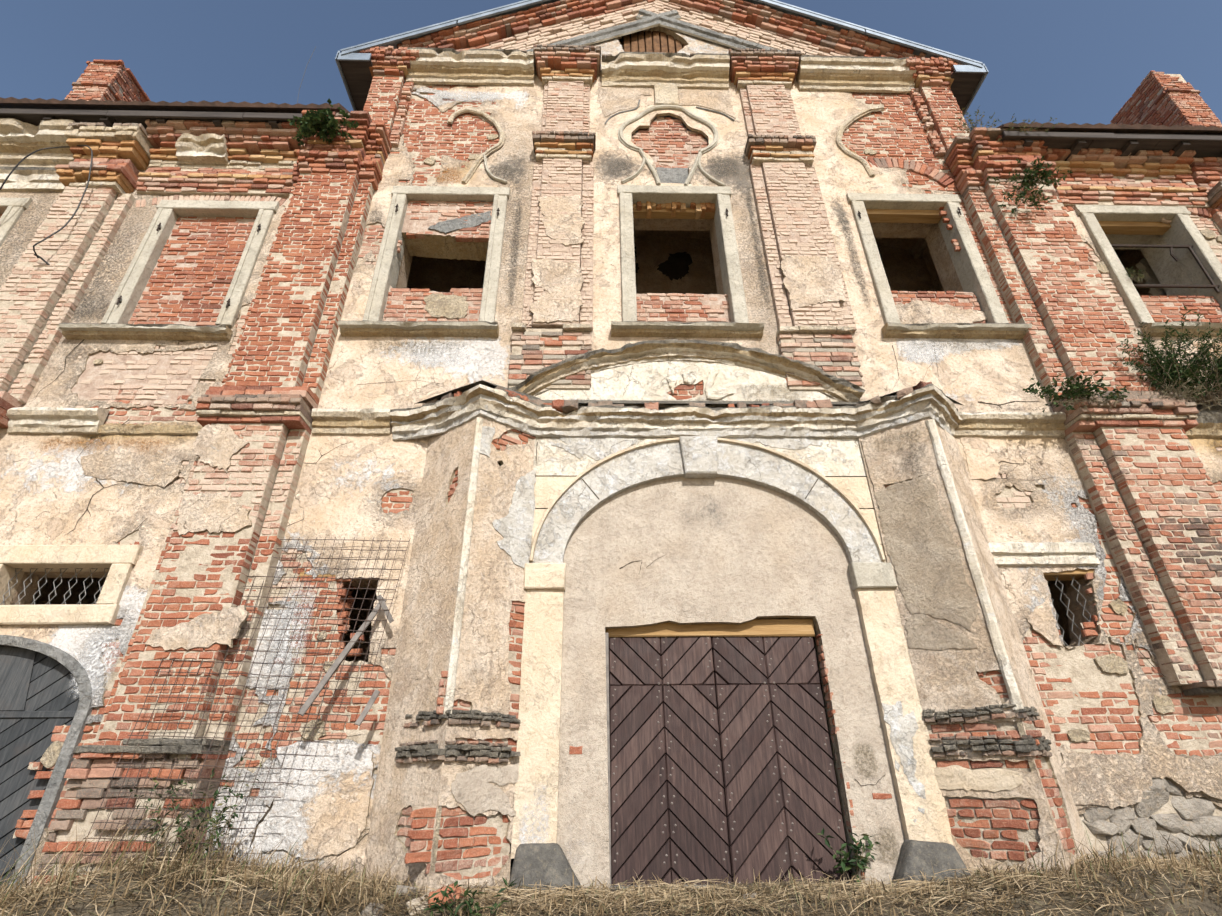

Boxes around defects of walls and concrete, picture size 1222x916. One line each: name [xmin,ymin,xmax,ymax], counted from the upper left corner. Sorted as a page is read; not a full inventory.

crack [34,339,85,400]
flaking render [13,619,123,842]
crack [65,419,130,535]
flaking render [145,605,249,651]
flaking render [219,549,396,787]
flaking render [397,601,525,880]
flaking render [644,381,705,410]
flaking render [874,474,978,650]
flaking render [881,497,1222,866]